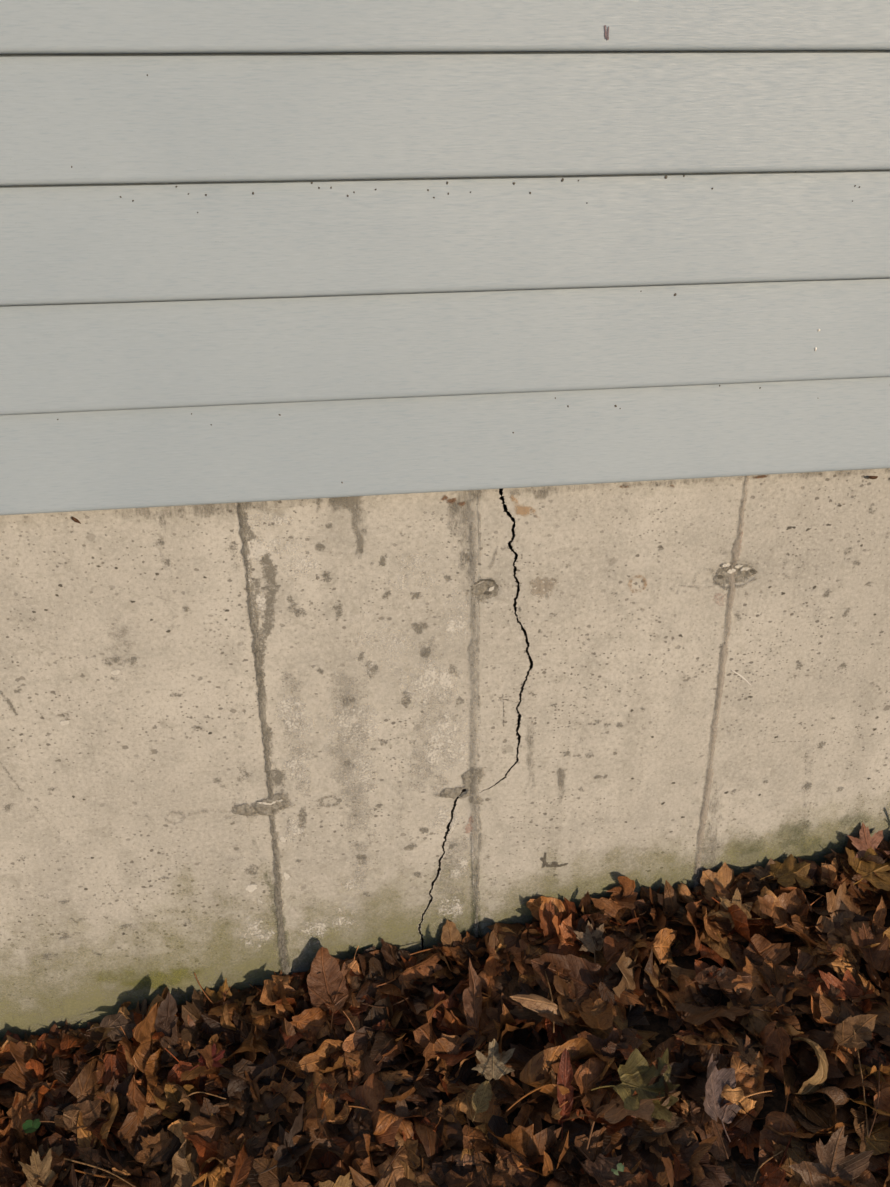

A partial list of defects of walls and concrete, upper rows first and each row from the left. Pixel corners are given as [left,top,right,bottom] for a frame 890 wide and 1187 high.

leakage [420,809,469,879]
crack [418,489,534,950]